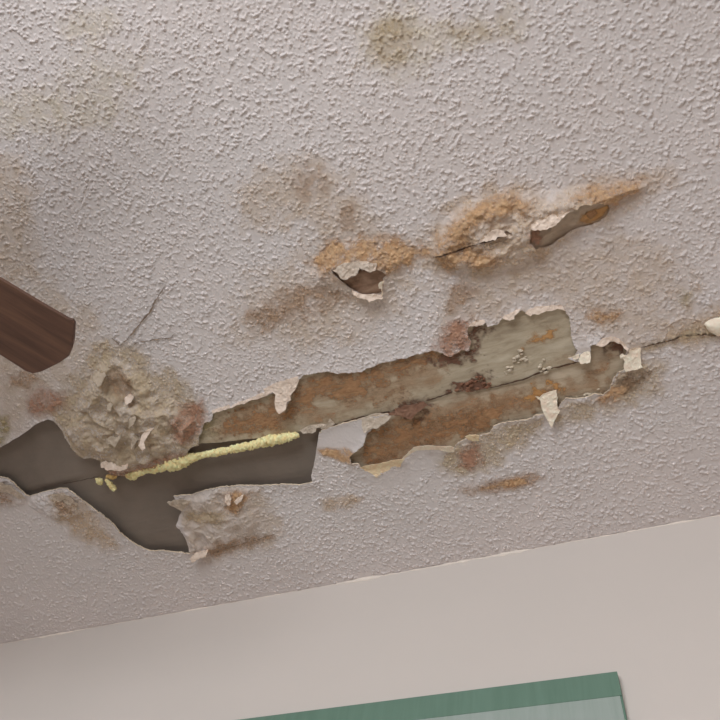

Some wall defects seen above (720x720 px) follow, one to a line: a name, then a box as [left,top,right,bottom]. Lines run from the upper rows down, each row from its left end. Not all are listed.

water stain [573,184,638,211]
water stain [313,189,536,274]
crack [112,288,174,348]
crack [642,333,716,348]
water stain [48,341,203,475]
flaking render [199,305,643,478]
flaking render [128,415,153,452]
flaking render [101,461,128,471]
flaking render [225,494,244,506]